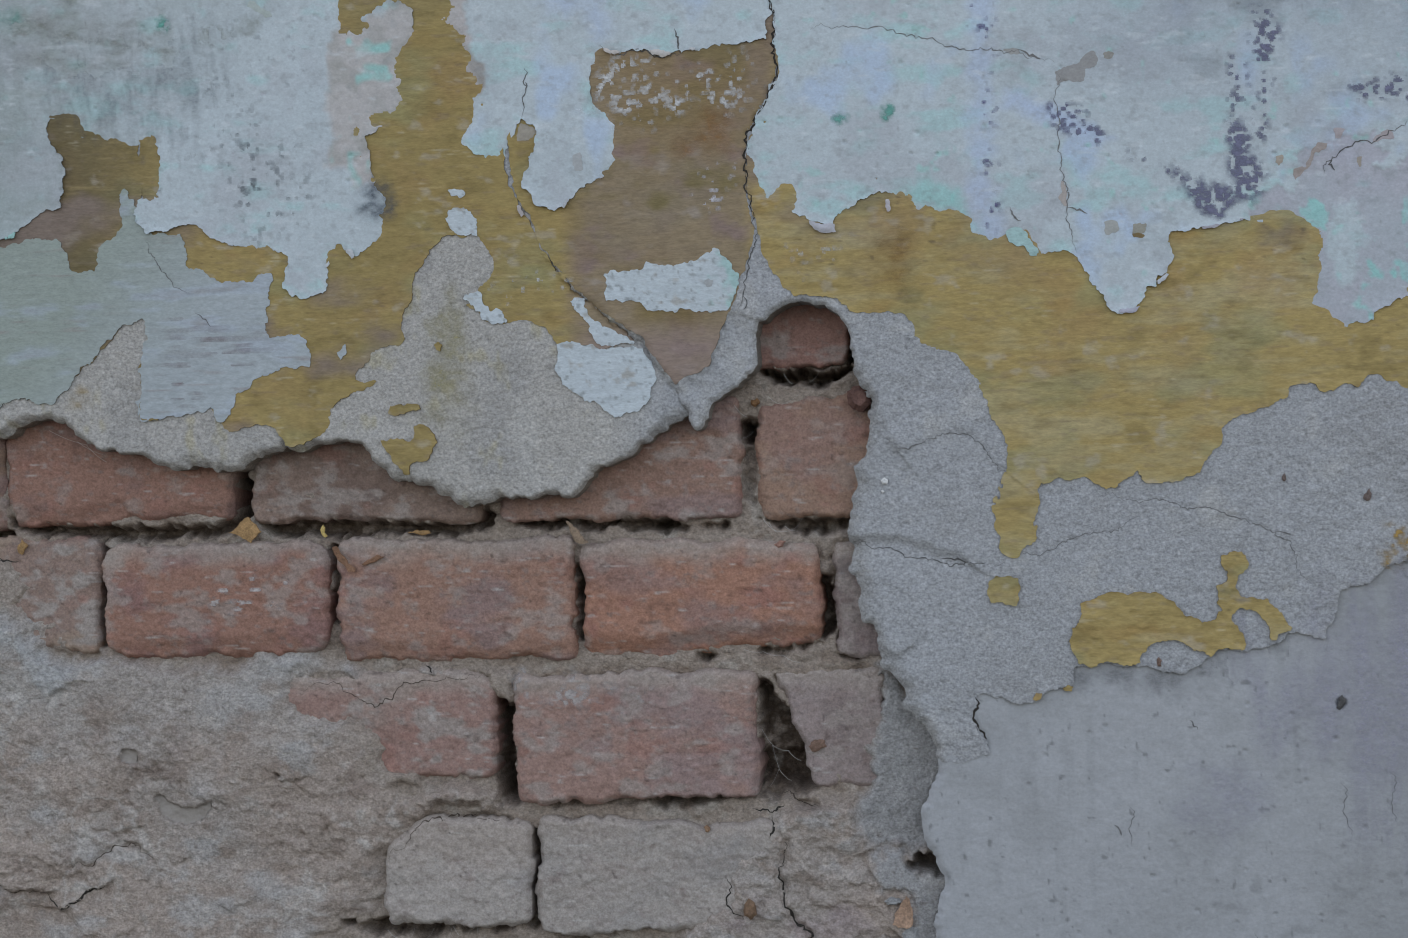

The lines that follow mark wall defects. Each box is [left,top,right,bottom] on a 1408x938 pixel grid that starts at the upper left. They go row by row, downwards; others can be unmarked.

peeling [0,113,160,273]
peeling [150,0,612,447]
flaking render [0,192,1008,508]
crack [741,0,778,309]
crack [815,23,1086,249]
peeling [507,1,1408,764]
crack [753,790,818,938]